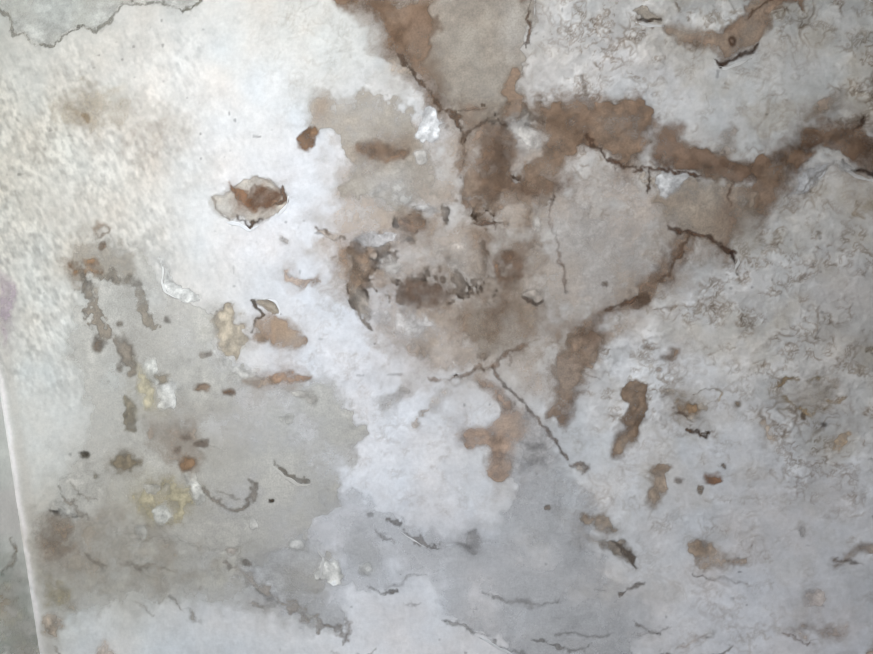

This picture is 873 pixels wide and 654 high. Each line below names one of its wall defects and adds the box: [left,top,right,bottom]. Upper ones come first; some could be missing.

spalling [633,0,804,70]
crack [397,54,486,143]
crack [585,134,703,192]
spalling [212,176,289,232]
damp [284,270,319,288]
peeling [358,232,396,247]
damp [296,0,873,482]
crack [664,226,740,277]
damp [123,396,136,432]
crack [460,344,568,458]
damp [111,452,142,471]
peeling [45,252,369,641]